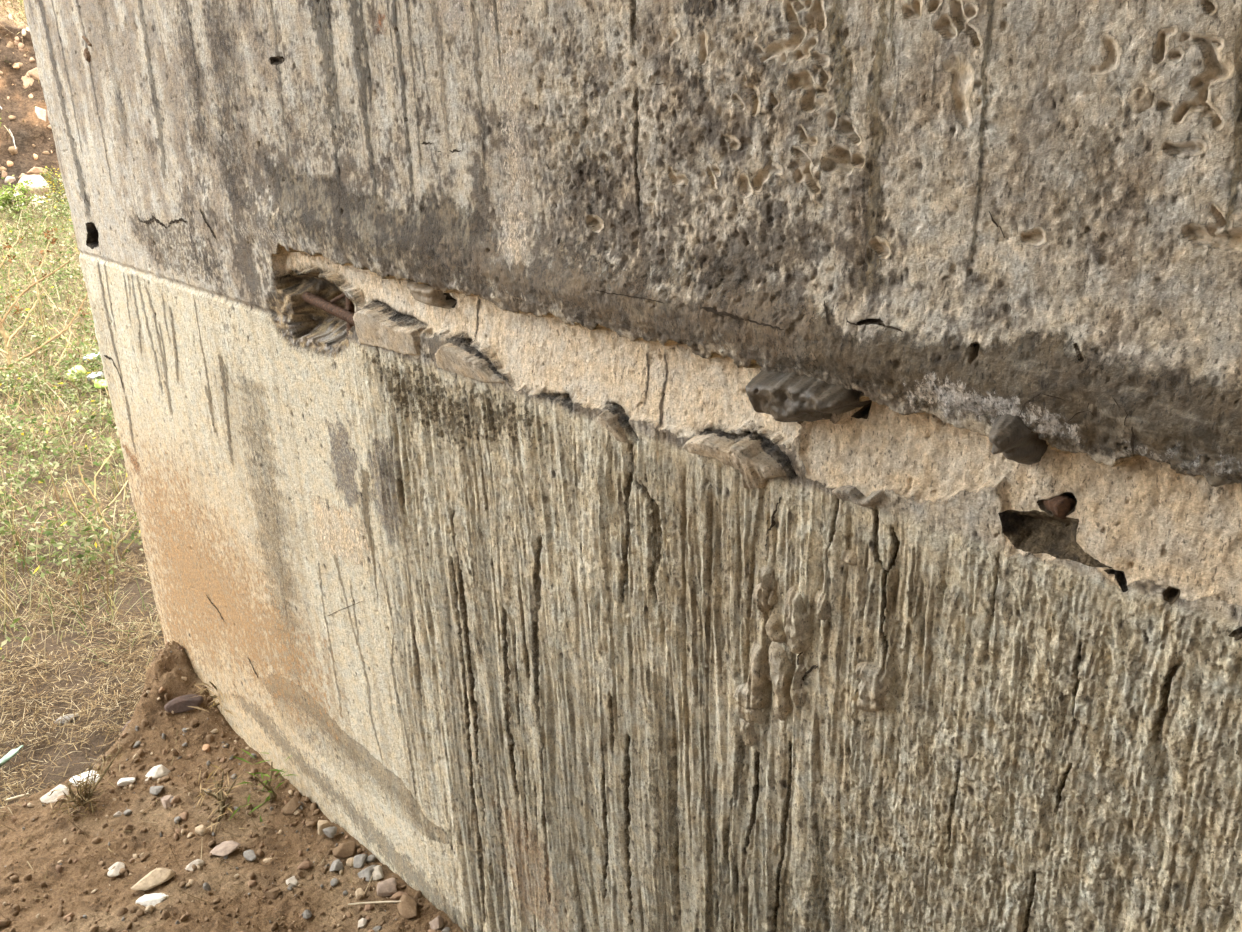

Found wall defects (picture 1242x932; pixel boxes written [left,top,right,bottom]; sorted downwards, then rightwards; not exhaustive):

crack [137,209,215,238]
leakage [176,0,1242,484]
leakage [97,262,178,452]
spalling [269,243,1242,606]
leakage [193,296,480,932]
leakage [470,526,485,657]
spalling [1228,626,1242,641]